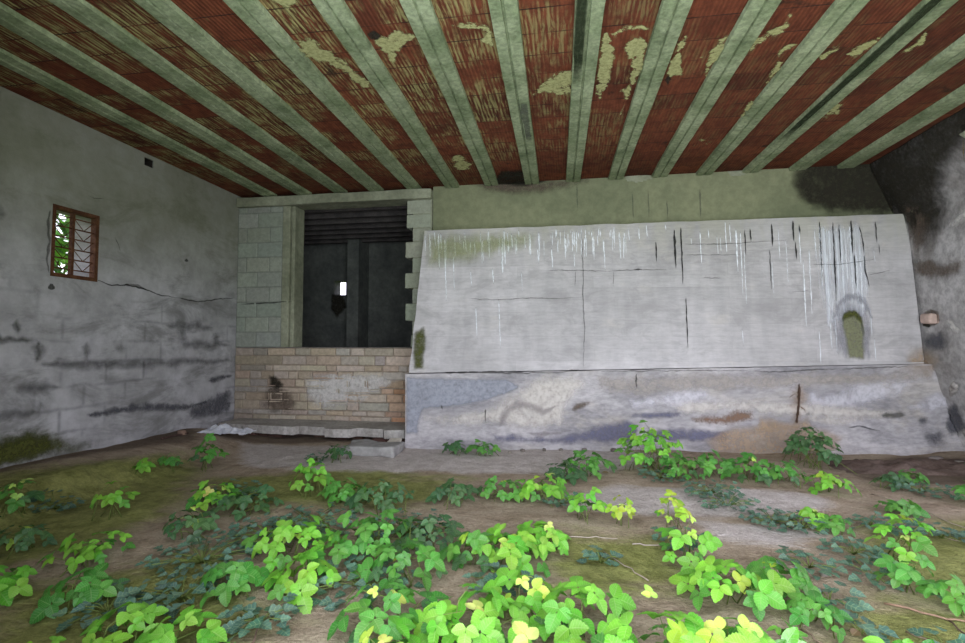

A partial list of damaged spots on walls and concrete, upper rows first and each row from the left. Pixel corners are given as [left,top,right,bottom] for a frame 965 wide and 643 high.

peeling [294,38,369,88]
peeling [368,30,415,62]
peeling [595,25,648,100]
peeling [750,14,792,51]
peeling [533,71,572,95]
crack [44,212,52,271]
damp [770,107,965,364]
damp [665,223,752,303]
crack [98,280,286,304]
damp [89,392,230,416]
damp [536,422,636,443]
damp [927,406,964,442]